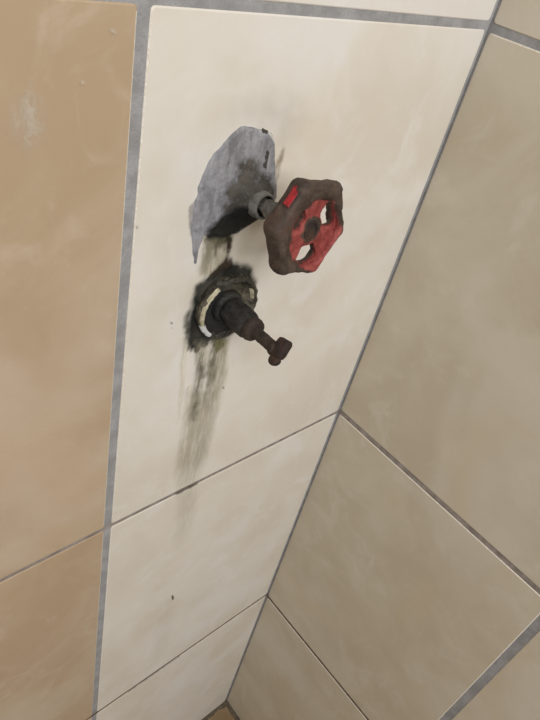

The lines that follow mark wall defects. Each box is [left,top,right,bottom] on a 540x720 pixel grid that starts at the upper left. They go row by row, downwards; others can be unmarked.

leakage [181,265,256,395]